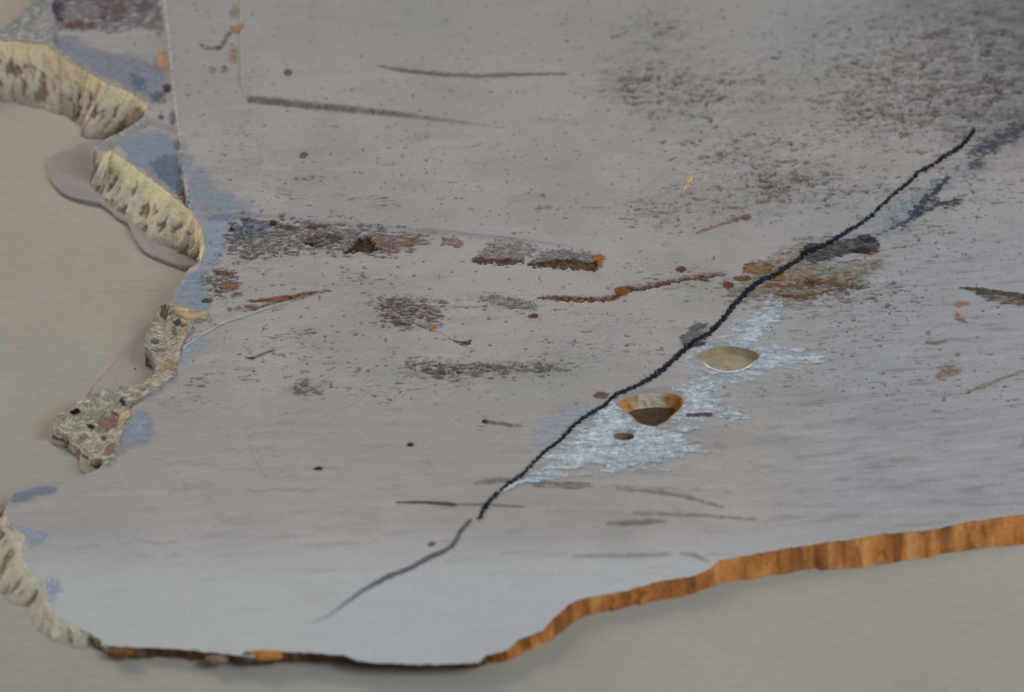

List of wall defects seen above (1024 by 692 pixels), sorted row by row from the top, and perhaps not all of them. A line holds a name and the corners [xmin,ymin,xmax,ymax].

leakage [480,294,831,492]
crack [362,128,975,591]
rust [726,236,889,307]
leakage [607,502,723,525]